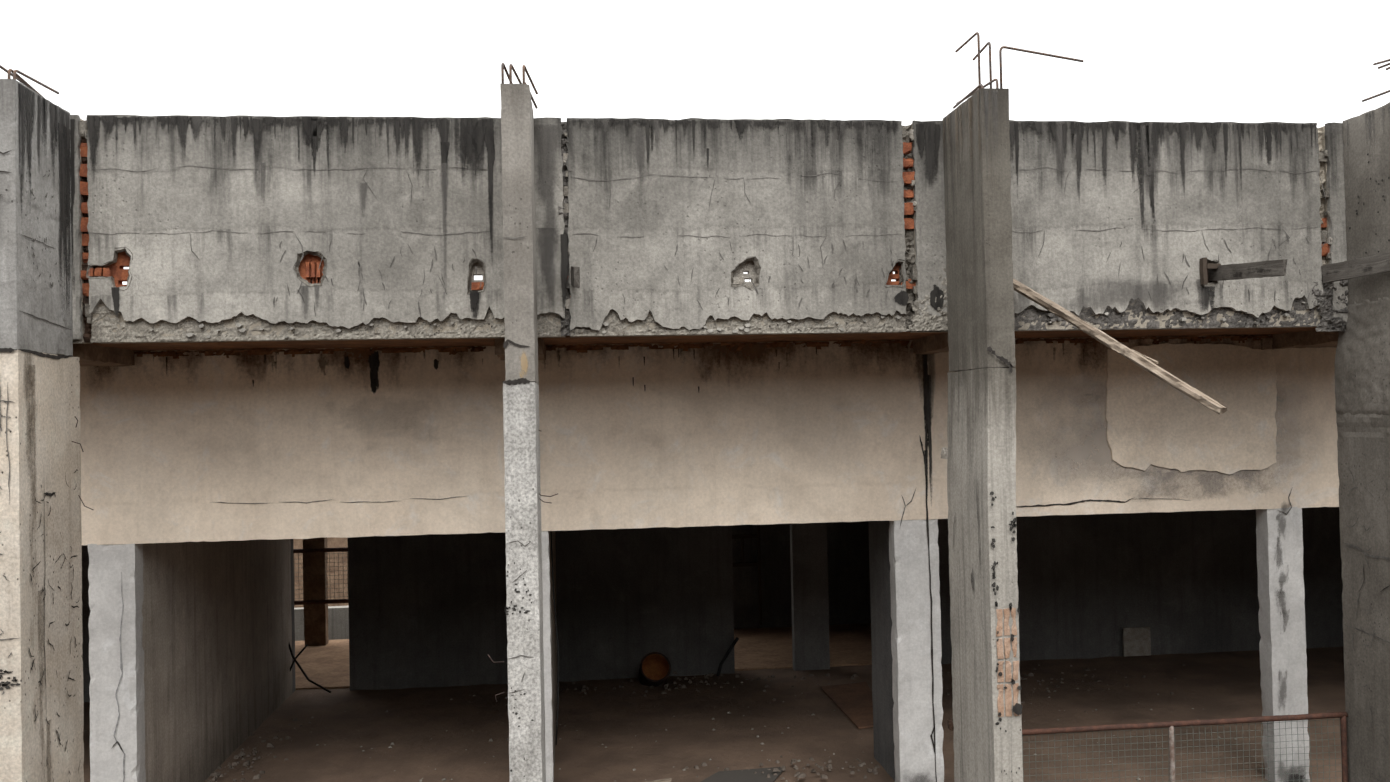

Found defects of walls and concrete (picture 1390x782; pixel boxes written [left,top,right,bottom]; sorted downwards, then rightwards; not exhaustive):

spalling [86,247,133,291]
damp [19,84,495,304]
spalling [73,300,505,343]
damp [537,119,898,307]
spalling [537,267,948,337]
spalling [731,256,761,289]
damp [916,354,934,488]
damp [916,90,1316,225]
peeling [1014,274,1349,474]
crack [1016,498,1190,507]
damp [1277,514,1288,625]
crack [1342,453,1390,782]